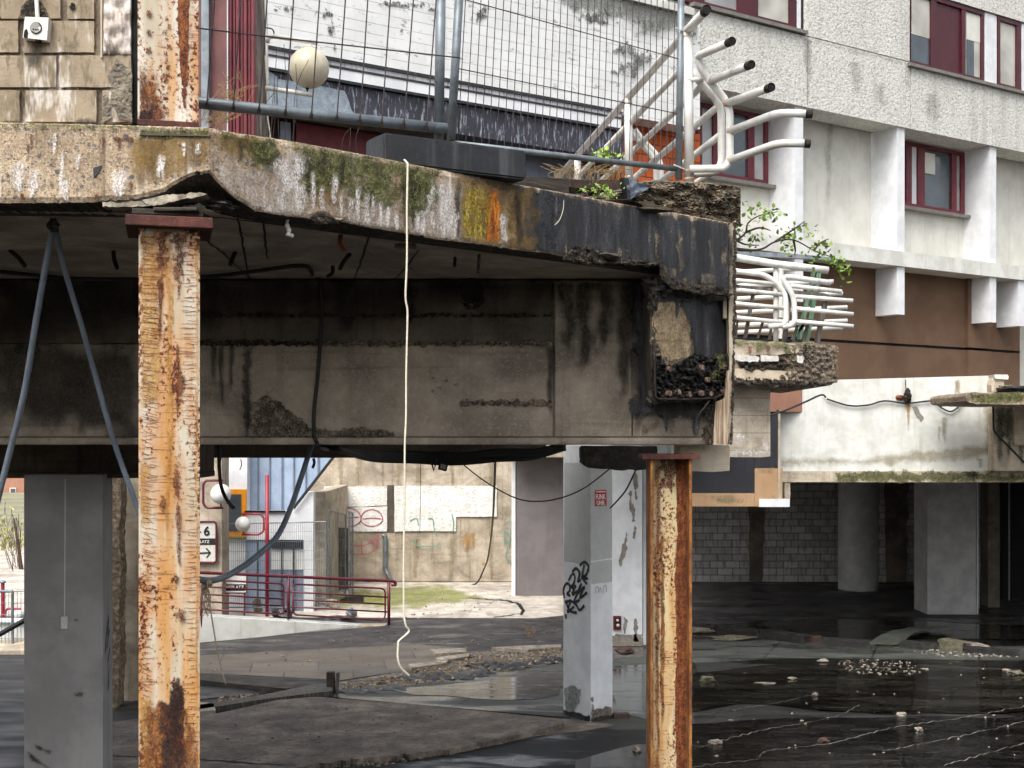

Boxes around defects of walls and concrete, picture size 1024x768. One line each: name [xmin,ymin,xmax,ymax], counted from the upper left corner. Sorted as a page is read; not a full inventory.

corrosion [140,0,190,120]
efflorescence [13,162,39,197]
efflorescence [53,134,80,200]
crack [101,192,163,205]
water stain [112,136,739,364]
water stain [0,278,139,434]
spalling [200,339,553,438]
water stain [531,278,706,435]
spalling [562,245,839,445]
corrosion [140,231,198,768]
corrosion [654,460,686,768]